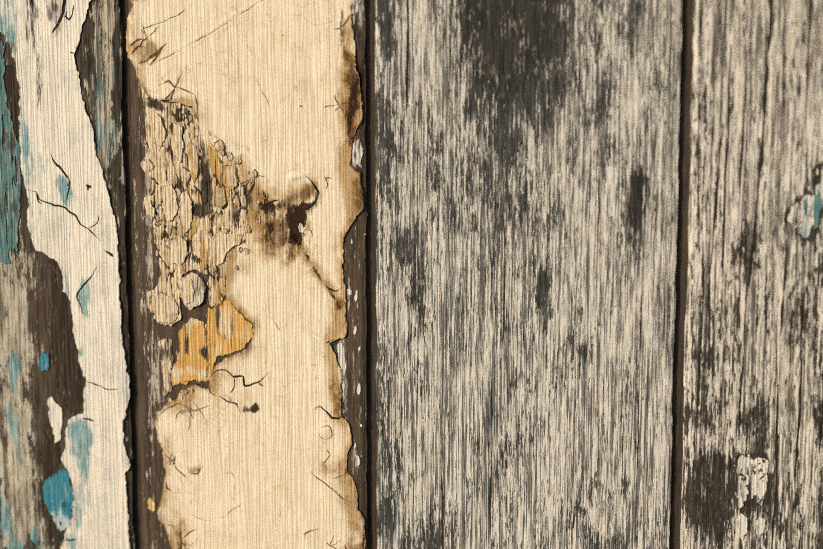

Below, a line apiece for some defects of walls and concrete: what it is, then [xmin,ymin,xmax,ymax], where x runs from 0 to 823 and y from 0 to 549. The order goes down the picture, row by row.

crack [130,0,262,116]
peeling [438,0,575,114]
peeling [0,0,131,549]
crack [28,152,113,313]
peeling [126,0,366,549]
crack [240,175,278,208]
water stain [259,185,318,260]
crack [300,176,330,210]
peeling [788,168,823,238]
crack [159,369,268,430]
peeling [687,397,770,547]